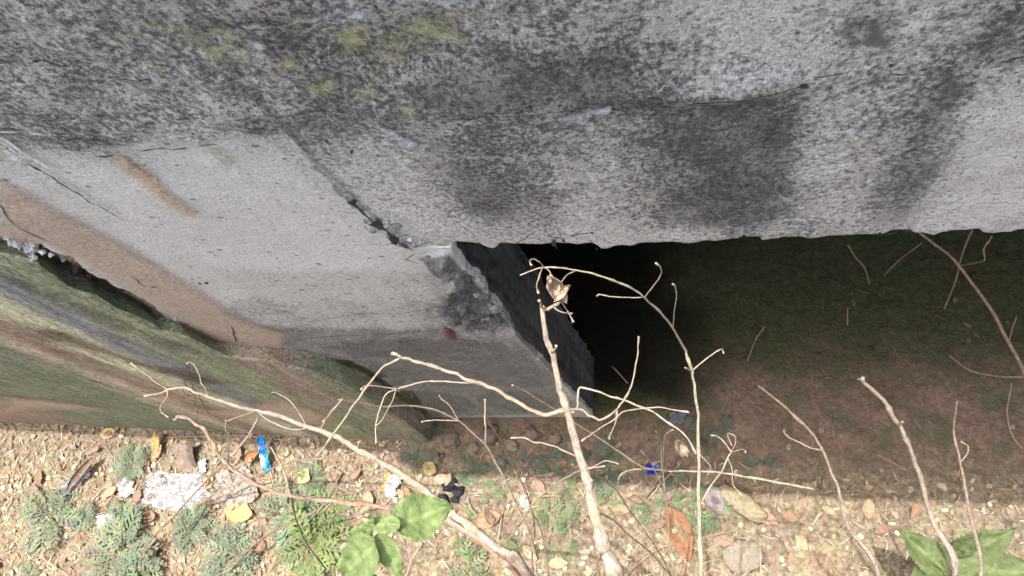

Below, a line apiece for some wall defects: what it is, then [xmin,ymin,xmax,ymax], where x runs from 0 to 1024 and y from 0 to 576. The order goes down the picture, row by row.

crack [20,161,122,220]
corrosion [111,154,196,219]
crack [343,196,451,264]
crack [515,232,594,249]
spalling [422,256,507,335]